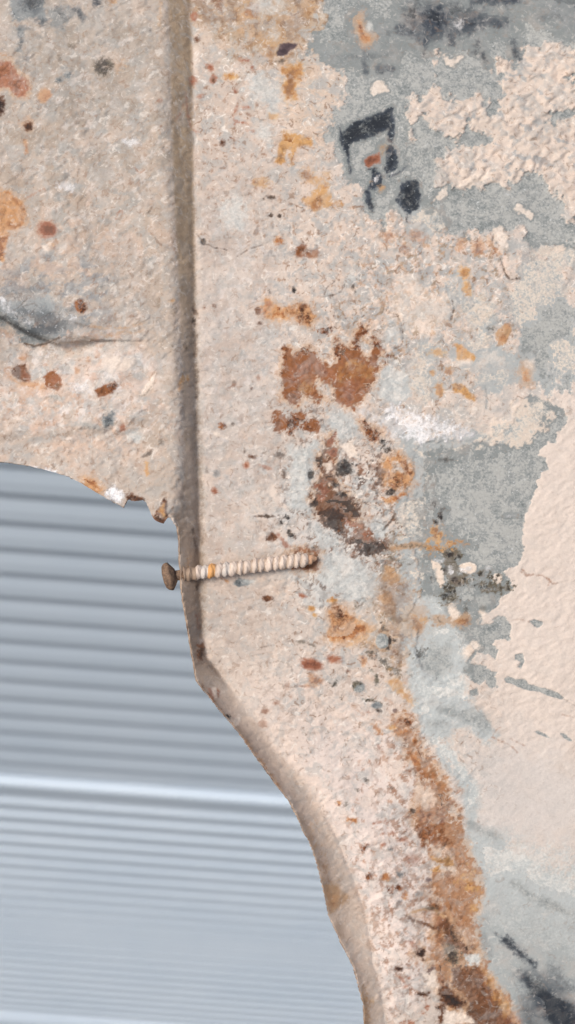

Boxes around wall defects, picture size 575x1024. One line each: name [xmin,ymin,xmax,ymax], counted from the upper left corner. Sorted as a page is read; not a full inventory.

peeling [316,0,392,43]
peeling [521,14,575,54]
corrosion [0,178,62,261]
peeling [278,41,575,610]
corrosion [180,543,196,572]
corrosion [191,275,427,802]
corrosion [300,670,532,1024]